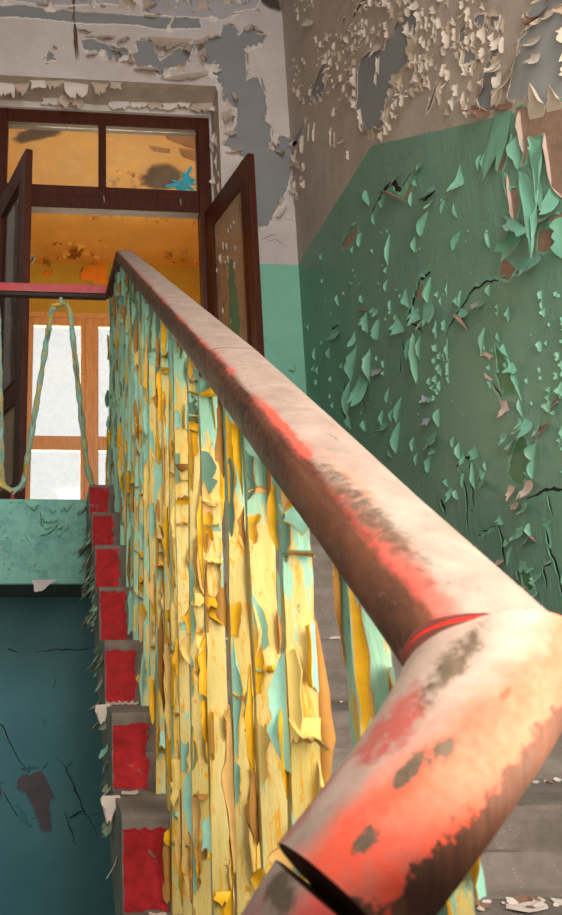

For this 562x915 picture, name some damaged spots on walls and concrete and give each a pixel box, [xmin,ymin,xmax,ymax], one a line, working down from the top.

peeling [0,0,562,282]
peeling [311,229,456,473]
peeling [0,299,87,536]
peeling [0,537,57,592]
crack [438,436,513,566]
crack [527,487,562,616]
crack [0,718,33,772]
spalling [0,762,57,833]
crack [57,756,102,844]